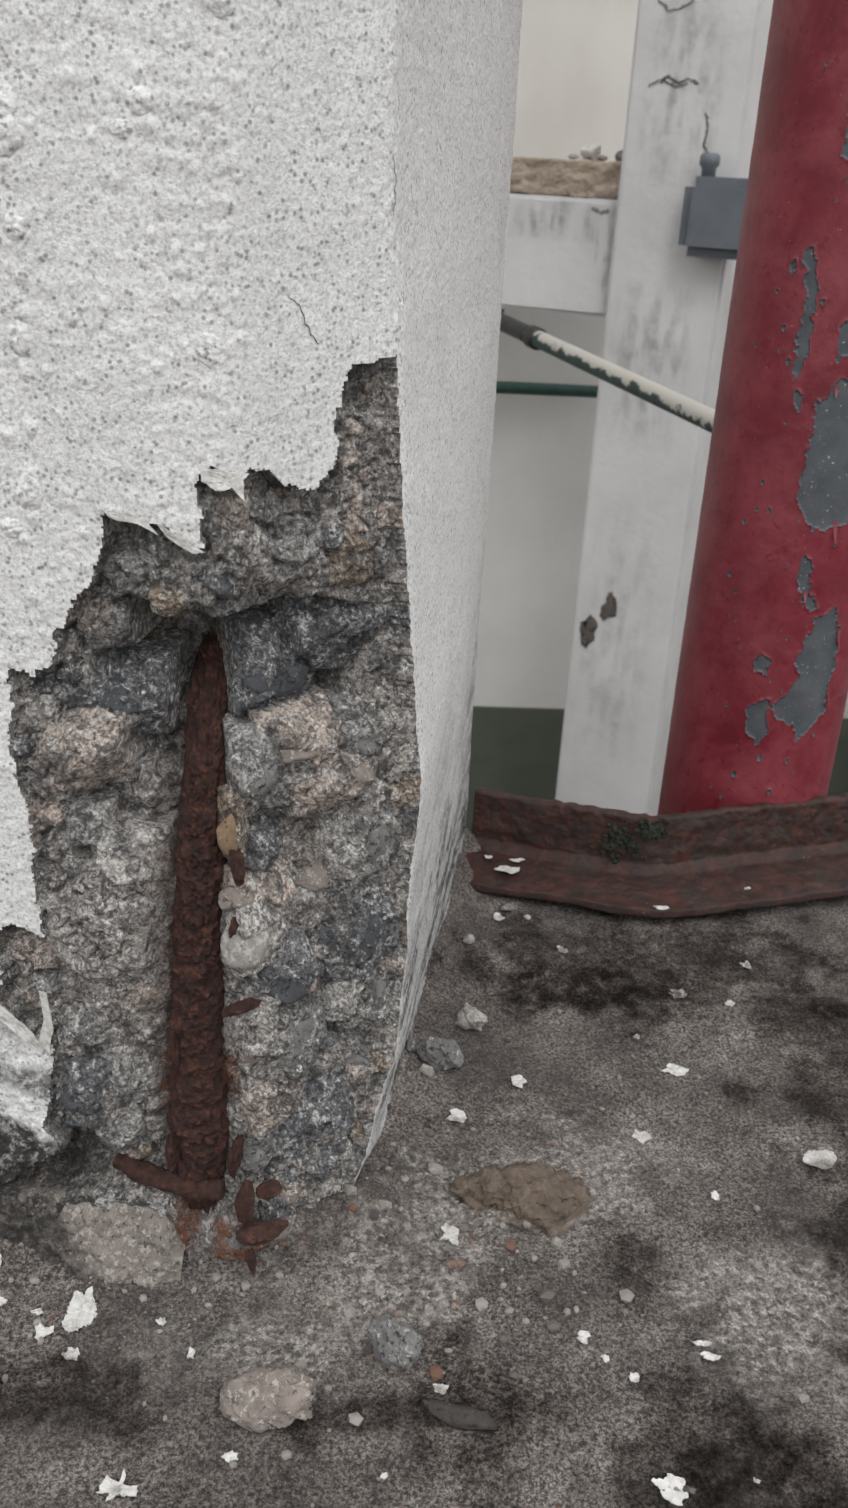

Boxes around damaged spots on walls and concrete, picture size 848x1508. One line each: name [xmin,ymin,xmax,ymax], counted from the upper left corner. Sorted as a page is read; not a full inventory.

peeling [840,100,848,160]
peeling [775,245,848,547]
spalling [0,354,421,1278]
peeling [724,555,841,775]